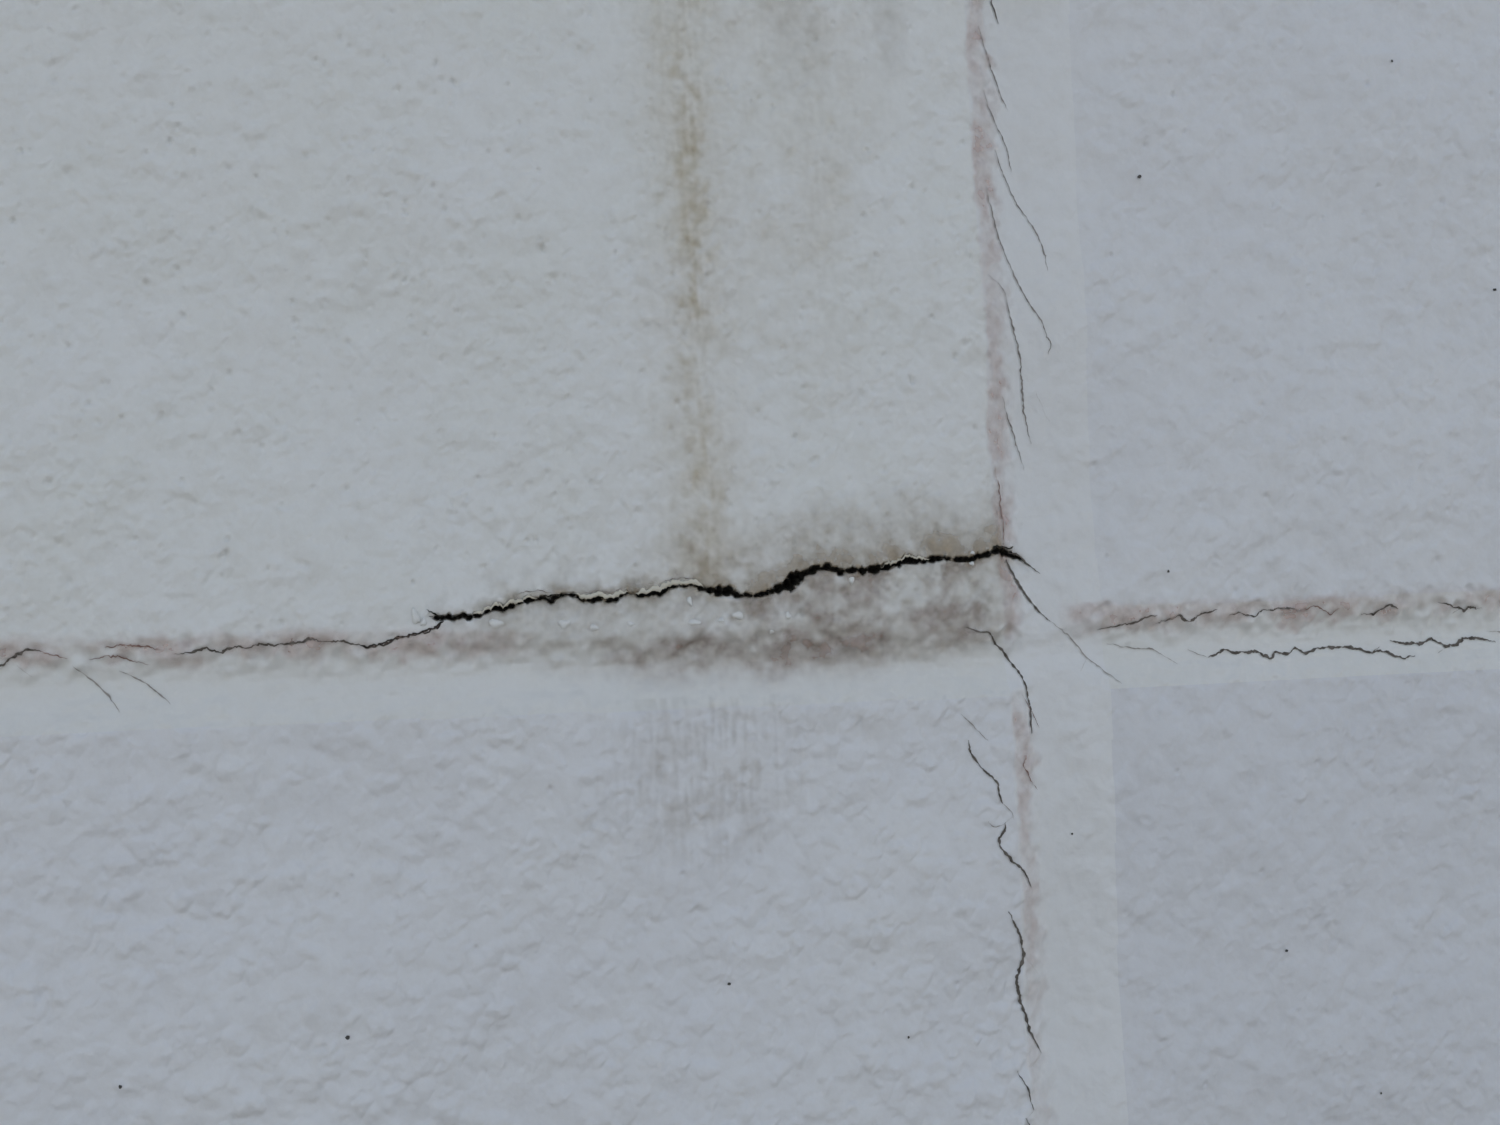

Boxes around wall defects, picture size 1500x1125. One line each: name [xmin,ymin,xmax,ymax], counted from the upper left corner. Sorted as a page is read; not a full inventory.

crack [0,0,1500,711]
crack [964,627,1041,1125]